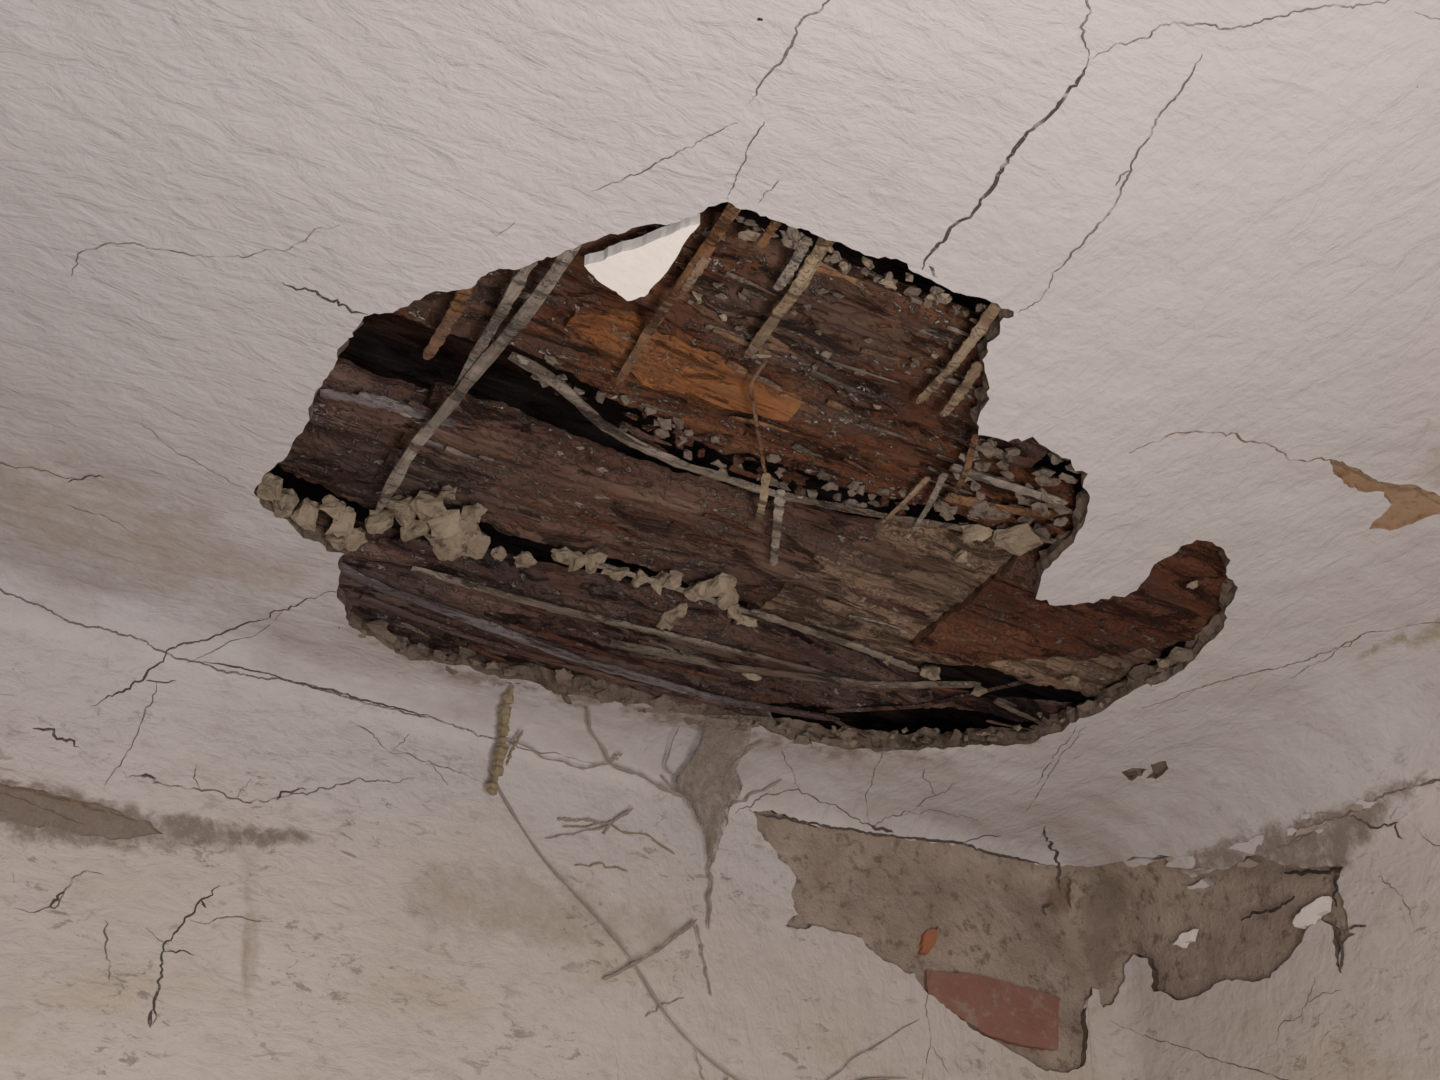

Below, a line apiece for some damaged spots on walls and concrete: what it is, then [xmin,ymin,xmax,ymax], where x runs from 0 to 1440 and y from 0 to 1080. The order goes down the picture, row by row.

peeling [584,214,700,301]
crack [593,0,830,204]
crack [922,0,1389,313]
spalling [970,302,1014,430]
spalling [1031,471,1090,599]
spalling [1330,459,1440,531]
crack [0,588,603,825]
spalling [673,547,1238,752]
damp [0,781,306,847]
crack [736,727,1078,916]
spalling [753,810,1355,1080]
crack [1241,778,1440,1036]